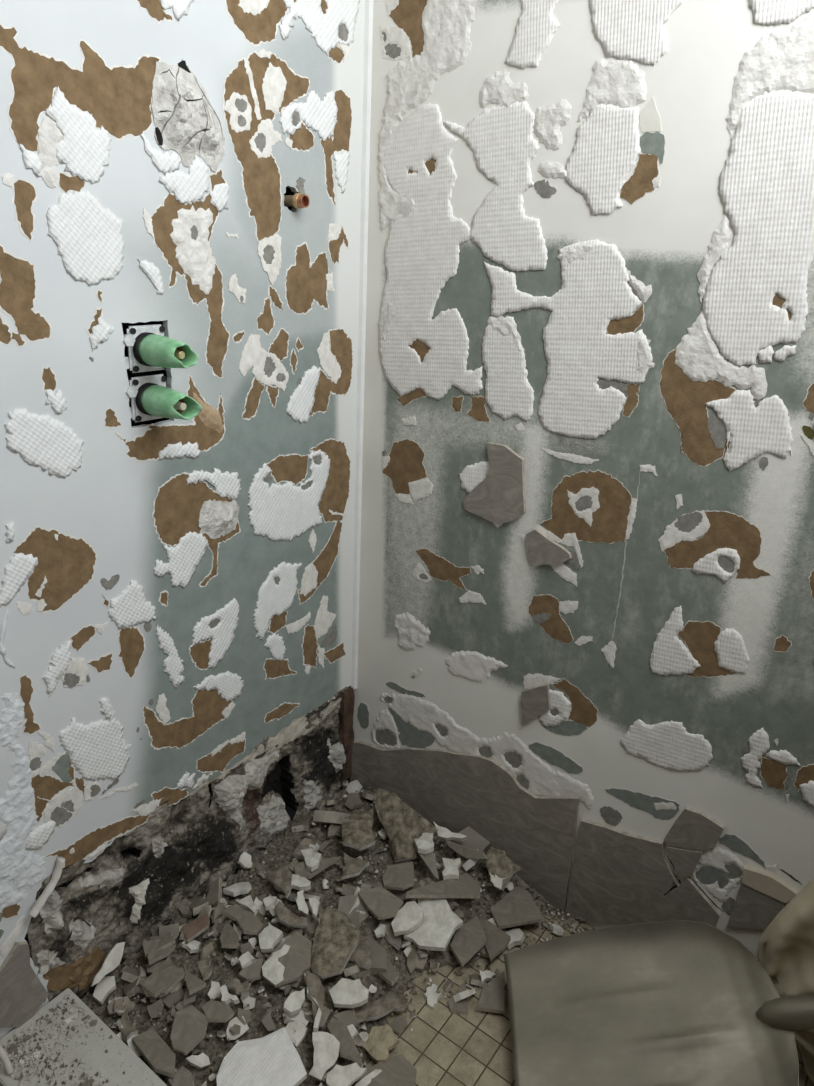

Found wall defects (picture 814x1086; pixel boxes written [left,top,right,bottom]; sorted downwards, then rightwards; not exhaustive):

peeling [380,0,427,61]
peeling [0,0,360,424]
peeling [659,349,736,467]
peeling [381,439,433,504]
peeling [0,375,246,868]
peeling [263,520,346,680]
peeling [528,449,657,668]
peeling [658,494,772,583]
leakage [244,764,277,830]
leakage [291,726,341,790]
peeling [520,673,598,736]
leakage [67,811,236,926]